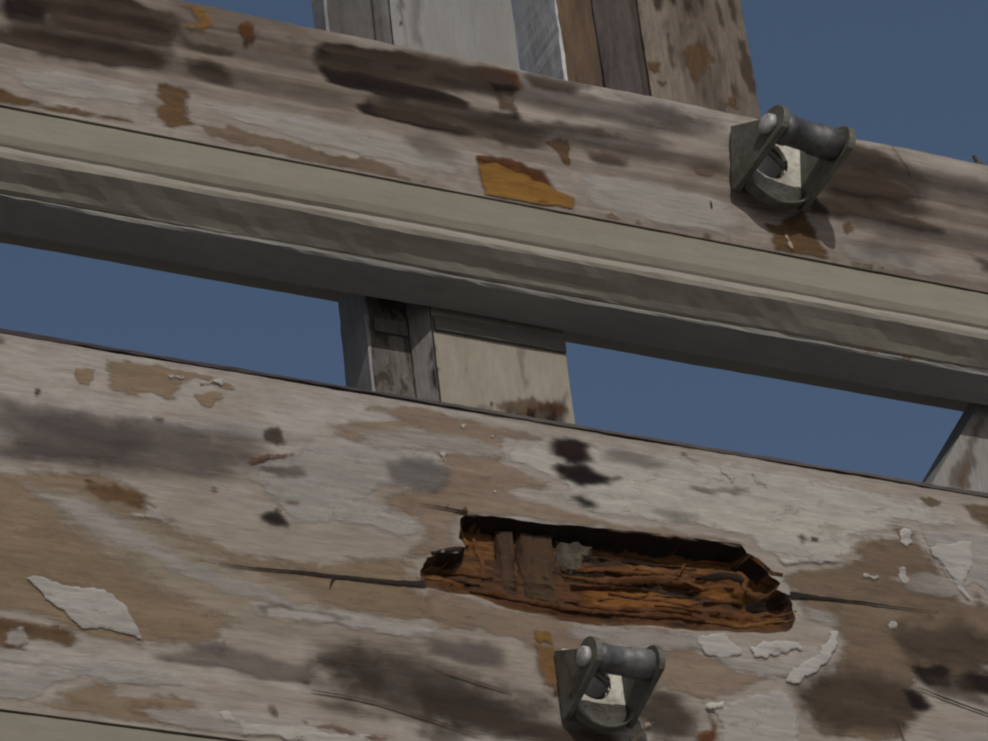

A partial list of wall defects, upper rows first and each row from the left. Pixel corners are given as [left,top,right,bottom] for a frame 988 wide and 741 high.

water stain [0,0,231,84]
peeling [0,89,129,121]
peeling [157,84,409,180]
water stain [315,42,614,147]
peeling [765,211,827,259]
peeling [106,361,233,408]
water stain [0,401,249,475]
water stain [552,438,622,506]
crack [219,563,427,587]
peeling [0,405,988,741]
water stain [318,639,618,741]
water stain [907,641,988,701]